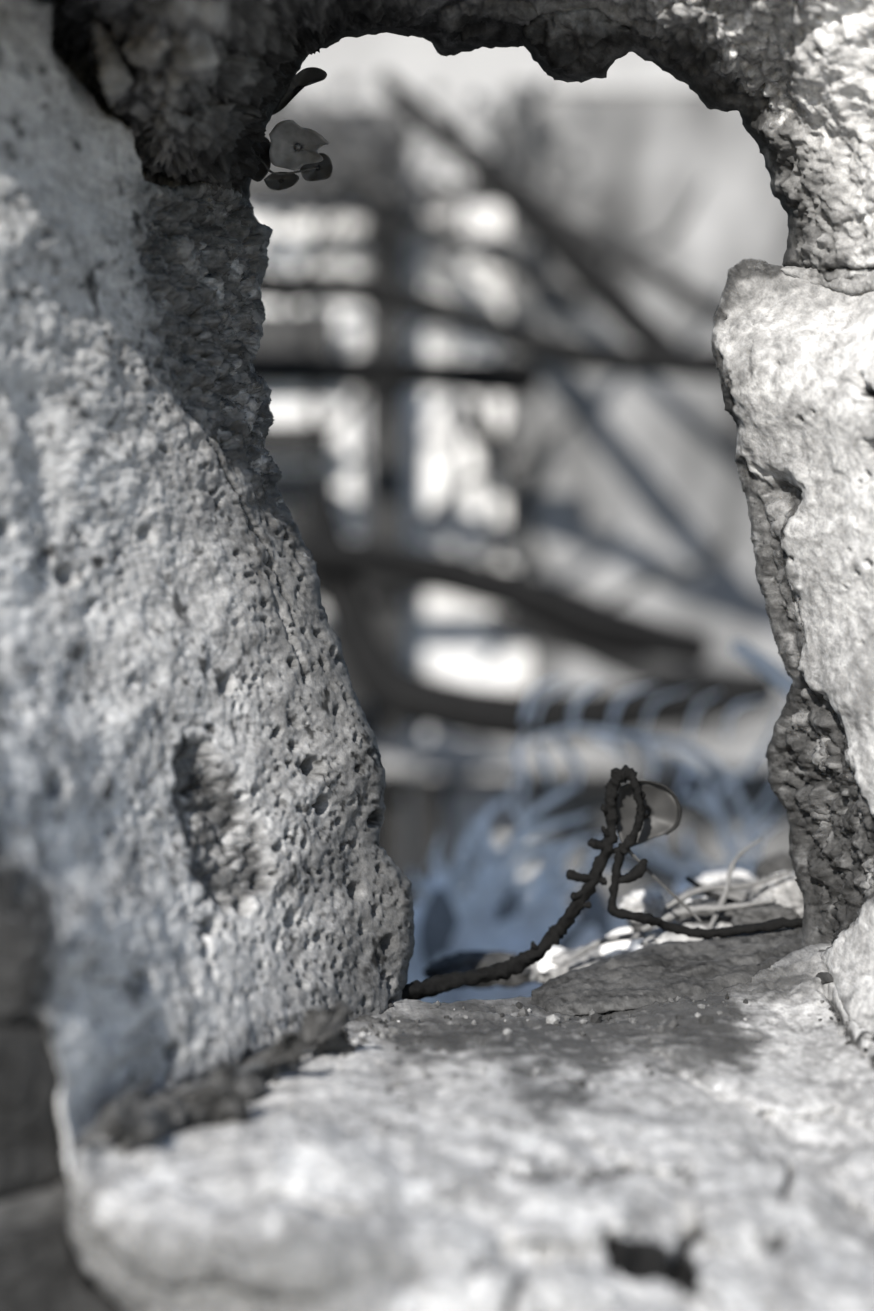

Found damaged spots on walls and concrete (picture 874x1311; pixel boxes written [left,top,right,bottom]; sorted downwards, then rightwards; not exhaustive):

peeling [685,0,812,127]
spalling [713,259,782,321]
spalling [711,343,737,427]
spalling [735,454,874,949]